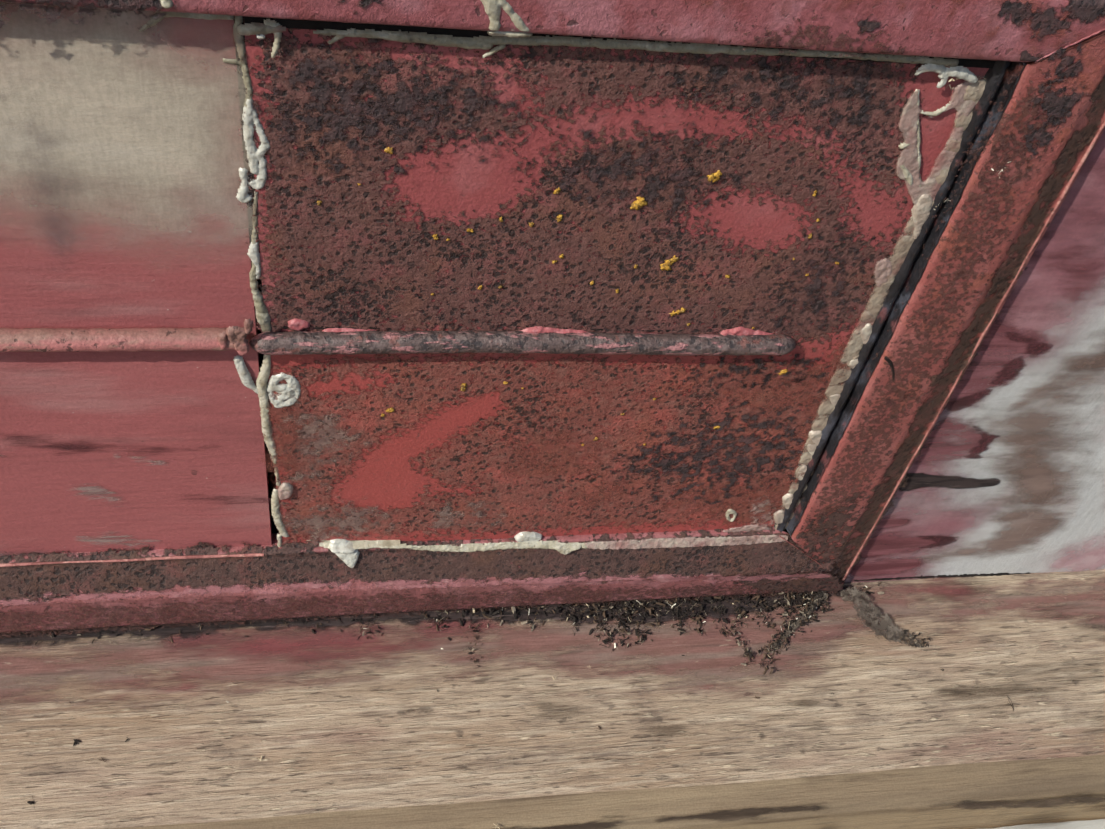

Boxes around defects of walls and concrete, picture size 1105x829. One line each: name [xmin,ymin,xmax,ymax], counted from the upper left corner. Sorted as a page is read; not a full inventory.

corrosion [0,0,1105,638]
damp [850,332,1105,576]